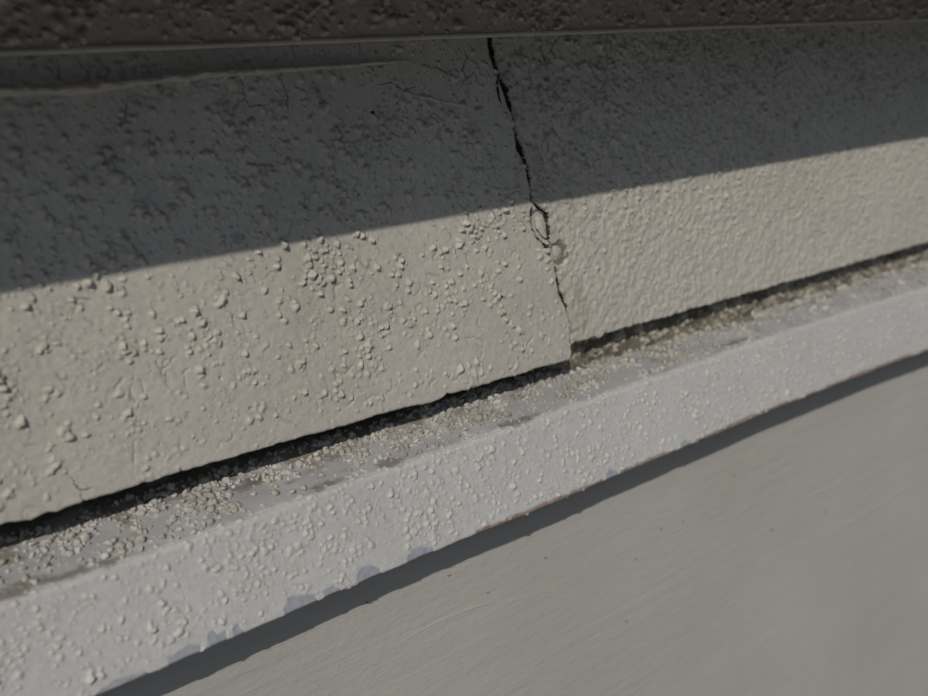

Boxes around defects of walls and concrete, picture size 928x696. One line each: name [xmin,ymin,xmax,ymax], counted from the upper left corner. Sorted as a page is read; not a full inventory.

crack [377,37,572,349]